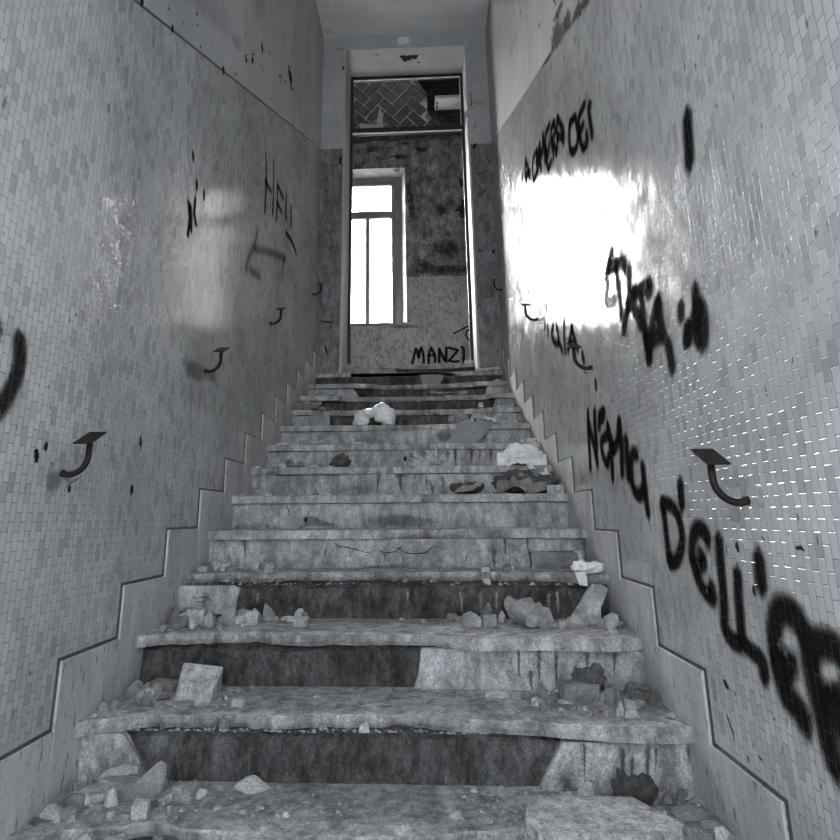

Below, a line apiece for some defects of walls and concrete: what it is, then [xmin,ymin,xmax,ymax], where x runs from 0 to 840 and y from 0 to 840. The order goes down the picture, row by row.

crack [325,541,440,563]